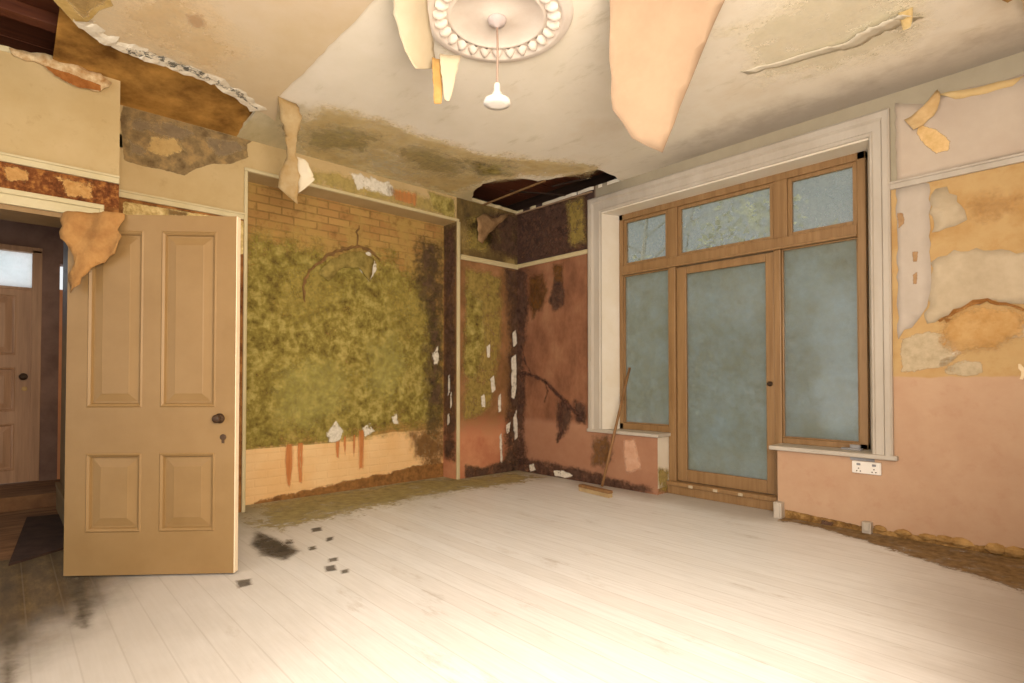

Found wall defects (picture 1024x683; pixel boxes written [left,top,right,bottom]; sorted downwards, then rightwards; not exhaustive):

spalling [9,7,267,175]
peeling [905,90,940,130]
flaking render [929,187,967,232]
leakage [245,110,595,559]
flaking render [900,248,1024,376]
leakage [778,517,1024,590]
leakage [67,576,90,624]